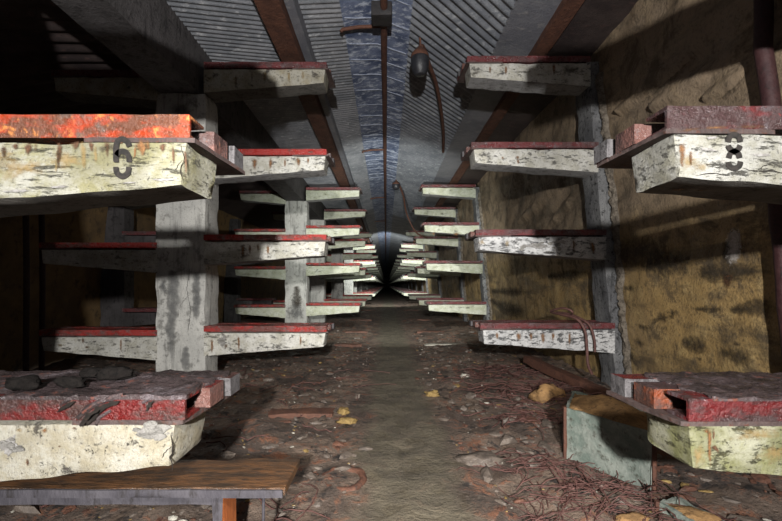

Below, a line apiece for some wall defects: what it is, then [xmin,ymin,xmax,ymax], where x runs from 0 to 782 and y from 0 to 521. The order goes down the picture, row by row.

leakage [702,230,756,287]
leakage [160,271,179,350]
leakage [731,299,764,314]
leakage [683,338,704,359]
leakage [723,343,749,363]
spalling [132,420,173,441]